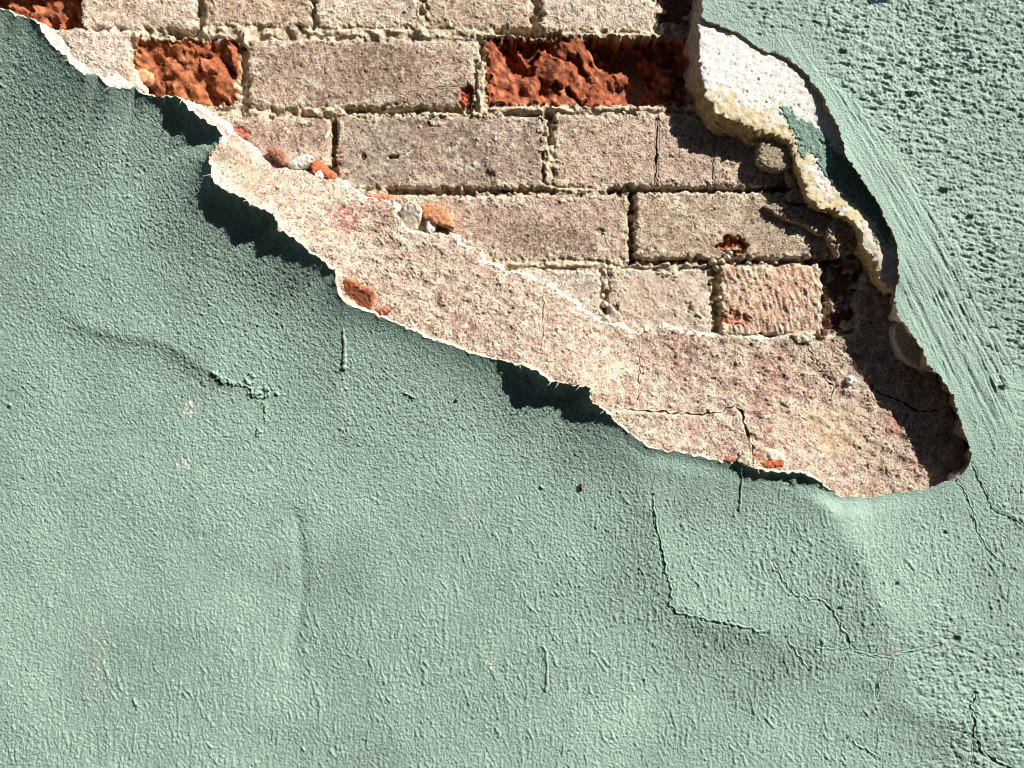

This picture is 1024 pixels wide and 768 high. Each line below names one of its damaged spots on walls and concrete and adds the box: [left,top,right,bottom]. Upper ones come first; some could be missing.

flaking render [0,0,972,498]
crack [650,495,940,700]
crack [955,462,1024,562]